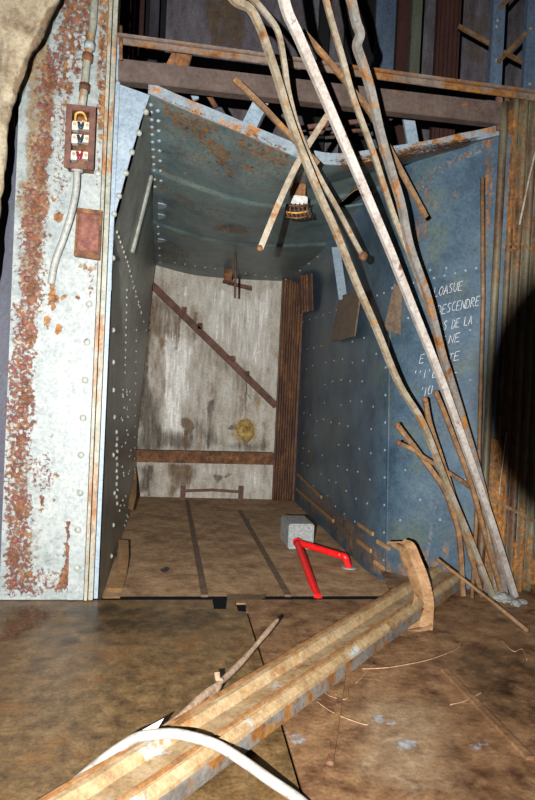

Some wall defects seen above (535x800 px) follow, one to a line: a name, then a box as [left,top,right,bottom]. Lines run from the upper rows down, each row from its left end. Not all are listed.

corrosion [164,101,297,187]
corrosion [356,152,384,168]
corrosion [396,137,489,205]
corrosion [1,0,109,641]
water stain [141,466,153,490]
water stain [171,464,193,493]